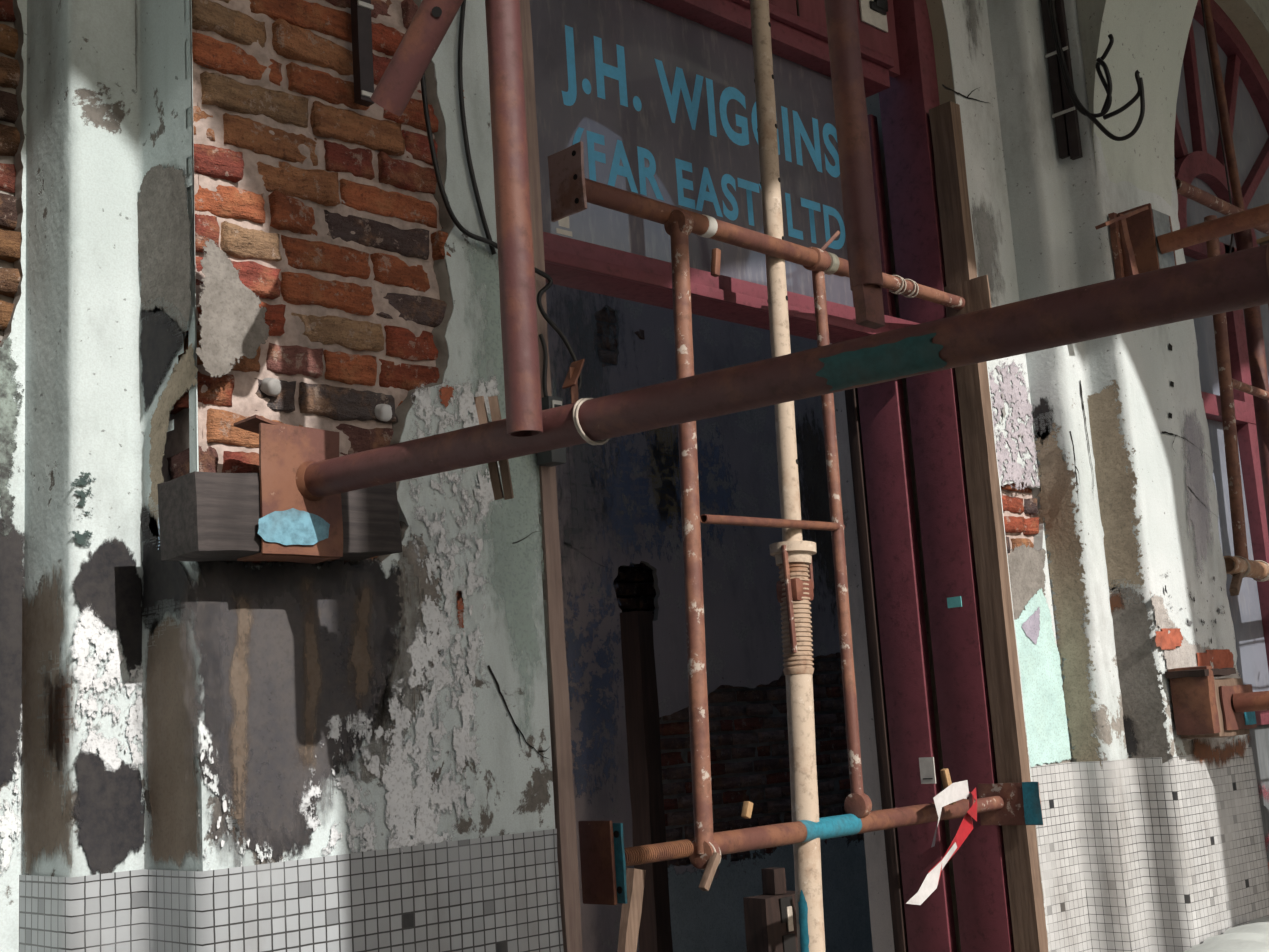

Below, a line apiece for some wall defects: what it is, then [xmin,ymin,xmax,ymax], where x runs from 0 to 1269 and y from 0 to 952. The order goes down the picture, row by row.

flaking render [0,0,25,536]
flaking render [137,0,499,541]
peeling [71,607,144,772]
leakage [0,505,409,875]
peeling [300,461,500,856]
flaking render [659,706,694,842]
peeling [667,844,795,952]
flaking render [708,672,792,833]
flaking render [812,653,851,818]
peeling [820,833,873,952]
flaking render [988,359,1102,769]
flaking render [1087,380,1241,765]